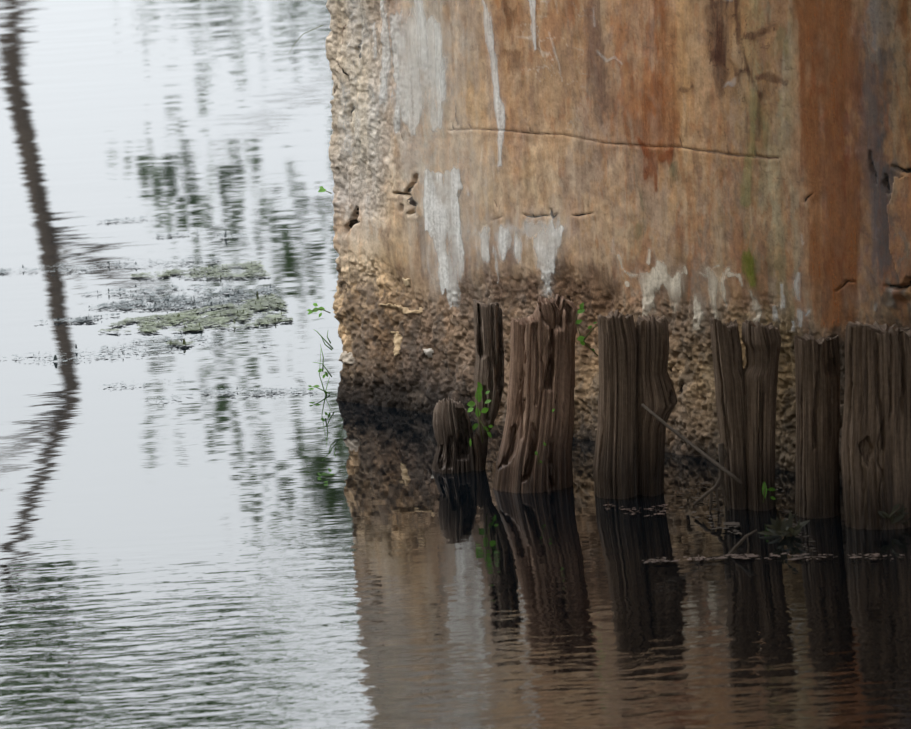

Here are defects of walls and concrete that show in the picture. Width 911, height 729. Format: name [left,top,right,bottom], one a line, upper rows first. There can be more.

efflorescence [375,0,445,134]
efflorescence [484,8,505,165]
crack [450,106,779,159]
crack [872,161,911,191]
leakage [419,168,464,306]
leakage [481,226,520,261]
leakage [528,221,564,298]
leakage [642,251,687,316]
efflorescence [693,297,702,329]
efflorescence [711,268,741,320]